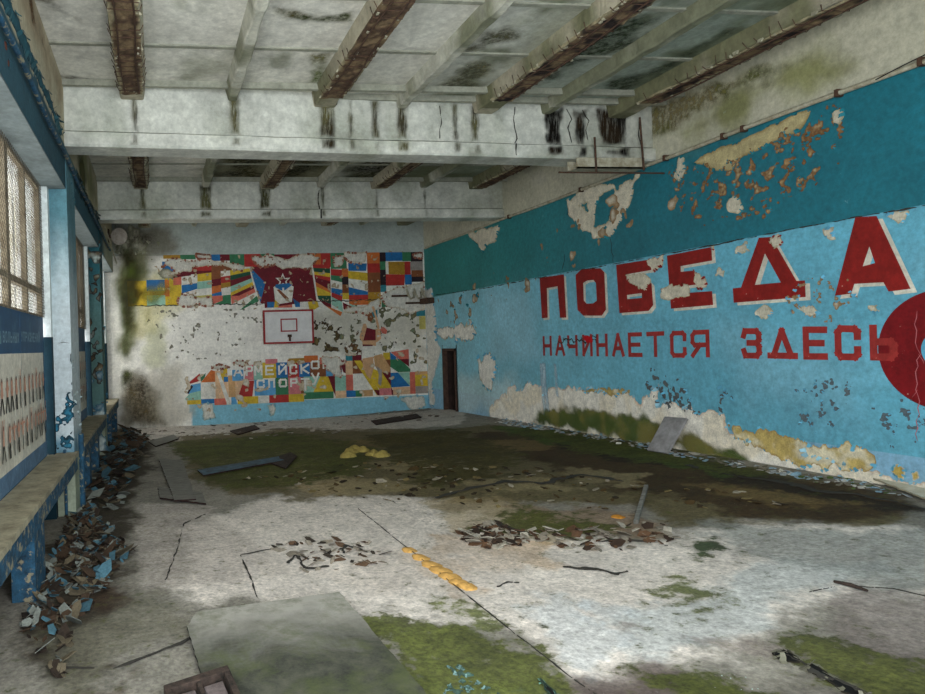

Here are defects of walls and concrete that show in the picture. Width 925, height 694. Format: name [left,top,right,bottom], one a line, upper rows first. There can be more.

leakage [545,109,562,154]
leakage [574,111,586,156]
leakage [597,109,628,156]
peeling [667,104,845,226]
peeling [565,174,640,245]
peeling [56,354,82,449]
leakage [125,378,156,424]
peeling [476,352,925,488]
crack [913,315,924,441]
crack [358,508,596,694]
crack [860,586,925,596]
crack [774,650,867,694]